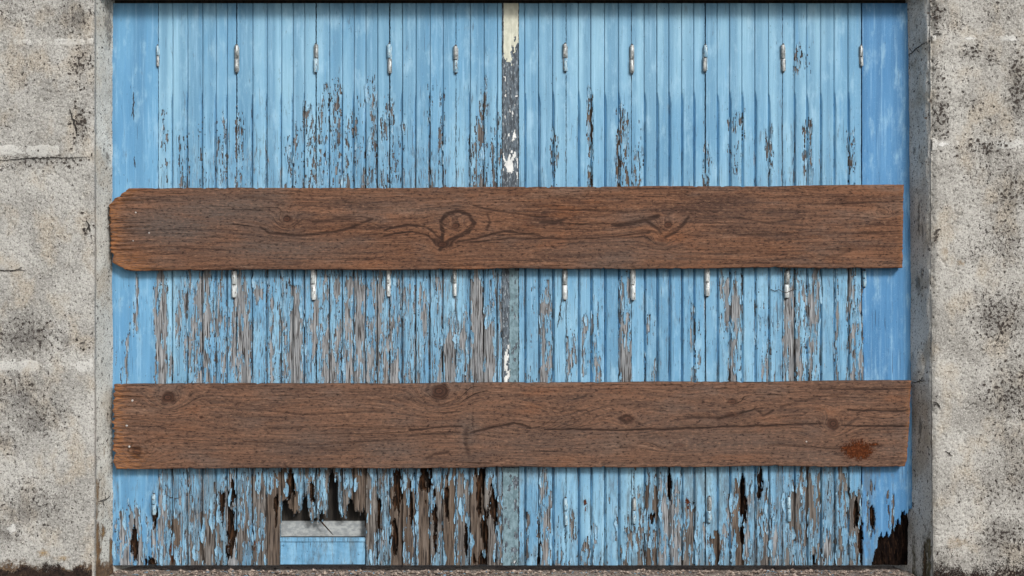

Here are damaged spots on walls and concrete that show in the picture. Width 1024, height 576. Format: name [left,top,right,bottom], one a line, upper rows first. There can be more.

peeling [160,106,246,188]
peeling [284,72,405,188]
peeling [468,74,518,187]
peeling [586,85,594,187]
peeling [615,100,644,187]
peeling [765,124,774,177]
peeling [153,268,553,384]
peeling [566,296,605,383]
peeling [618,269,657,382]
peeling [718,268,864,382]
rust [840,437,878,462]
peeling [112,466,894,566]